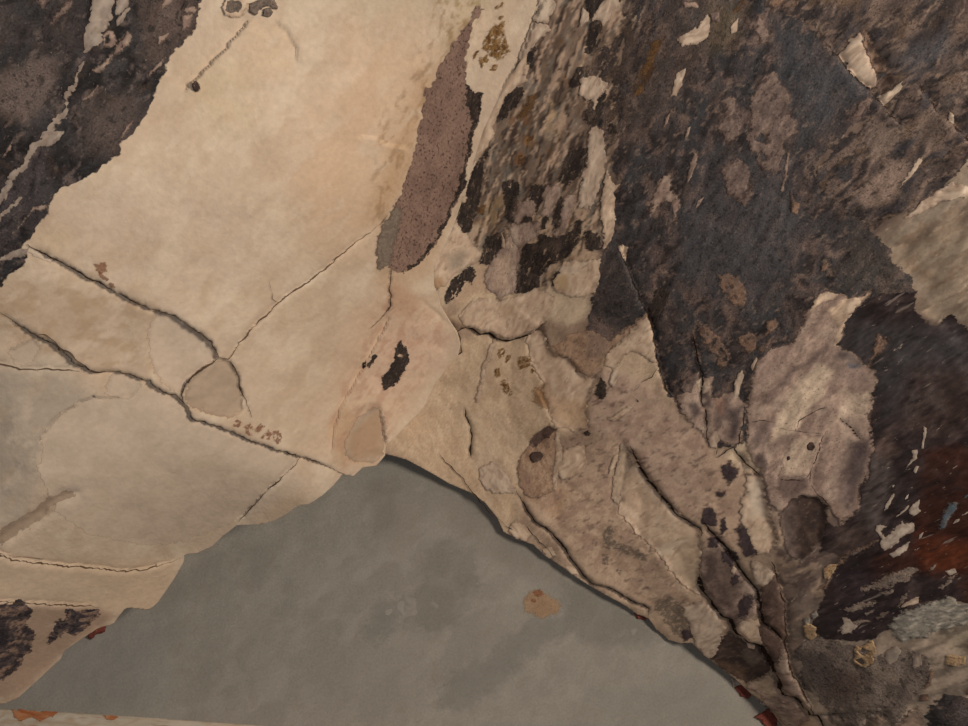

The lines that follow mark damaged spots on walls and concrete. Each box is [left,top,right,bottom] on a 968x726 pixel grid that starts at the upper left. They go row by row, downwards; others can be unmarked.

damp [456,147,491,233]
crack [0,215,388,520]
crack [617,239,861,506]
crack [0,553,183,572]
spalling [508,521,532,541]
spalling [609,443,763,659]
crack [630,446,824,726]
damp [699,507,786,683]
damp [779,495,829,560]
damp [888,596,968,642]
peeling [12,709,58,721]
spalling [747,649,810,726]